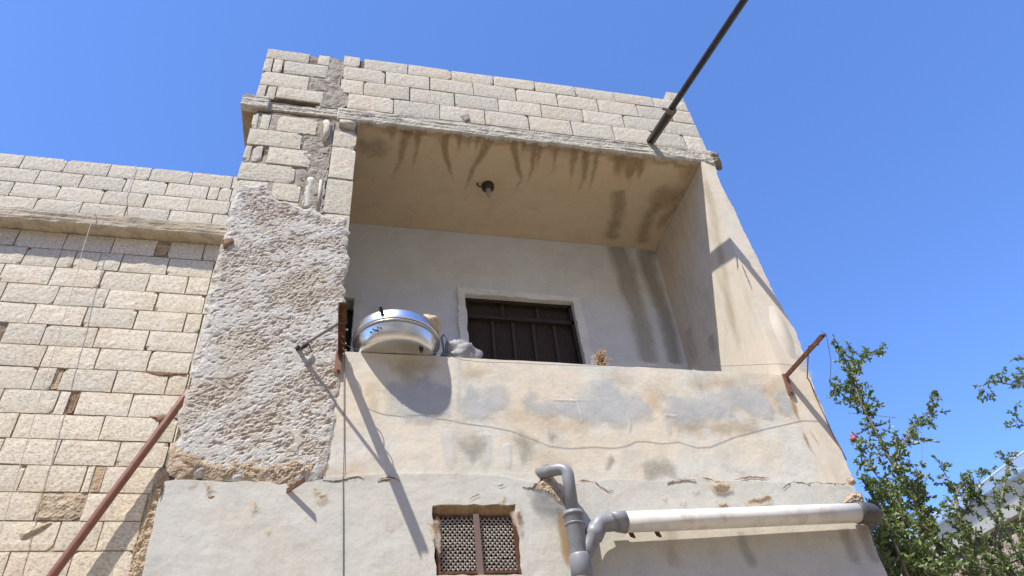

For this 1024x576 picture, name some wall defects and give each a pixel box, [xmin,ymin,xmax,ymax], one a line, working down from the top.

leakage [609,192,654,362]
flaking render [127,181,350,576]
flaking render [535,464,566,506]
flaking render [696,481,732,508]
crack [667,476,846,489]
flaking render [747,494,772,507]